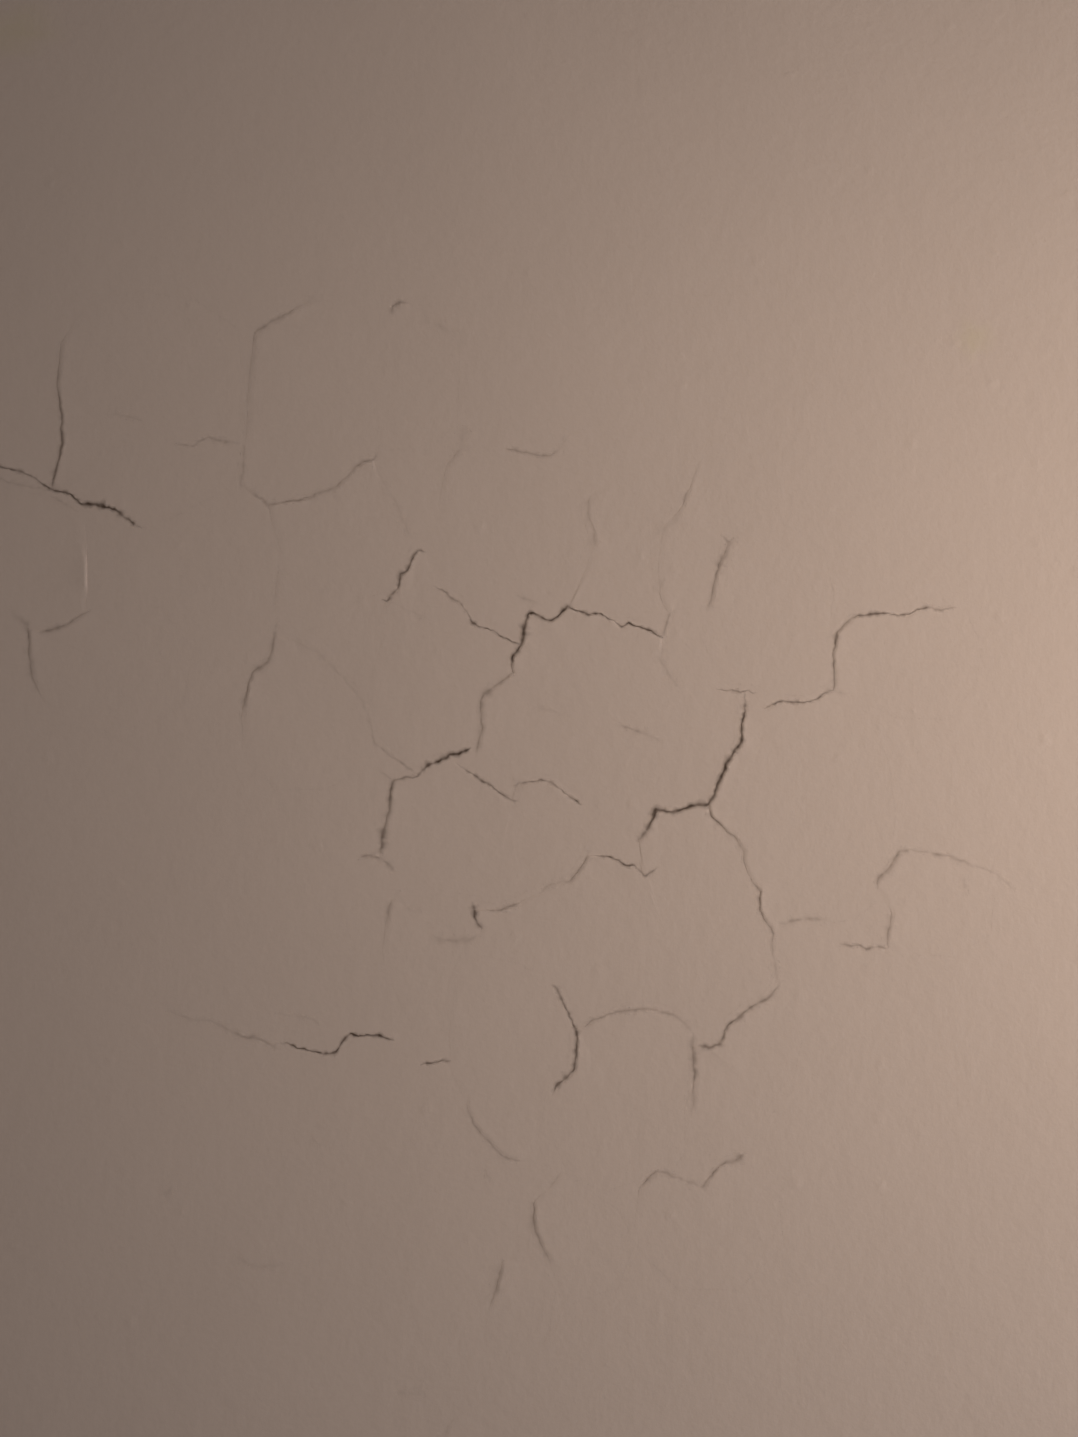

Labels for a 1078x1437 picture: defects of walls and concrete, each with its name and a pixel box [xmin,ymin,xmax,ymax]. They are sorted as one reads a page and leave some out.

crack [48,487,134,523]
crack [473,608,656,660]
crack [427,749,469,767]
crack [653,715,745,817]
crack [292,1033,383,1053]